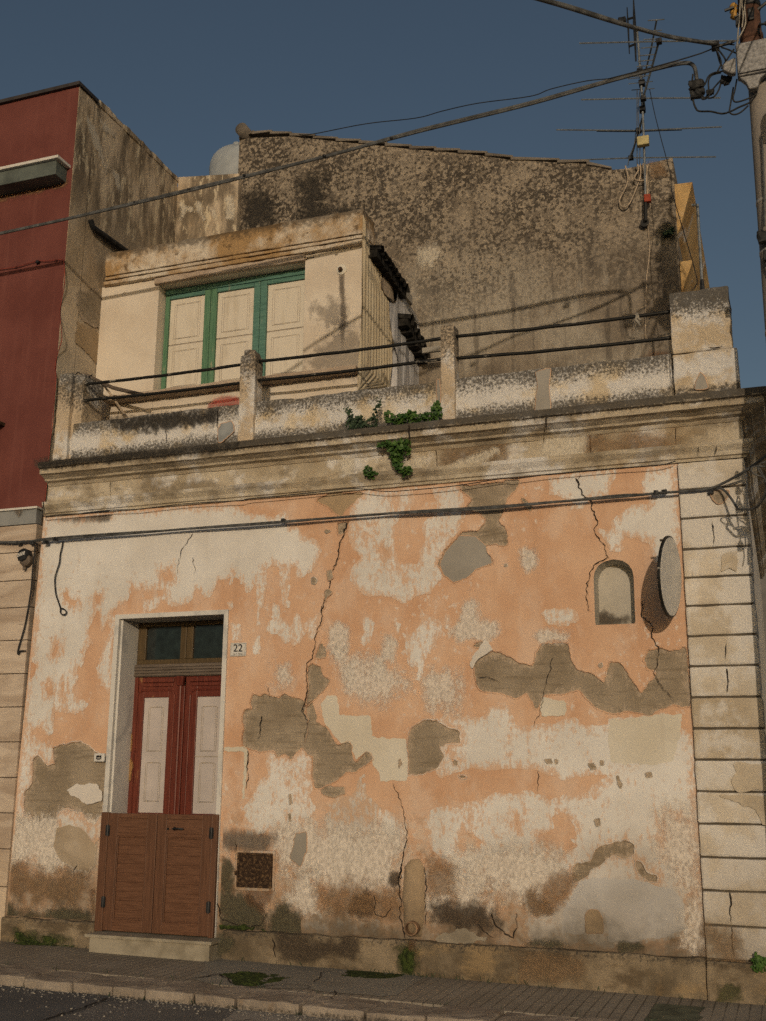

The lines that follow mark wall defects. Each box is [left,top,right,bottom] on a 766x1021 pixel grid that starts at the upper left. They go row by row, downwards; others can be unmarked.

leakage [293,171,361,220]
leakage [110,396,239,434]
peeling [548,469,617,510]
crack [576,476,608,612]
peeling [597,464,680,563]
crack [301,522,349,742]
peeling [11,479,705,953]
leakage [7,865,90,920]
leakage [217,831,358,961]
crack [374,784,427,938]
leakage [431,900,502,933]
leakage [526,890,553,916]